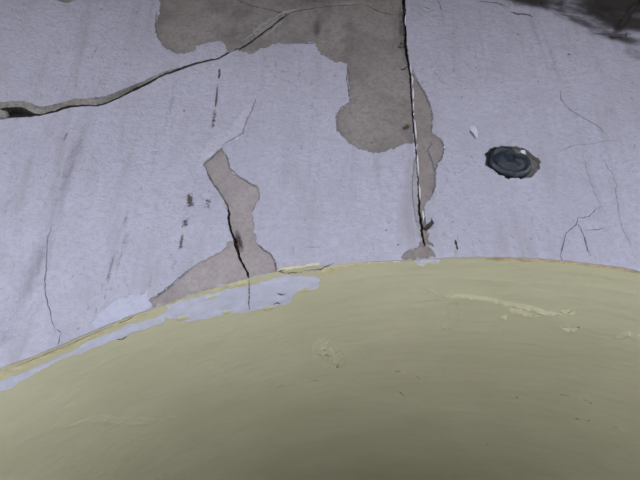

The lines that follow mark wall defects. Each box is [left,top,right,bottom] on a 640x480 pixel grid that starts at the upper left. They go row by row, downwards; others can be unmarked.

crack [0,0,425,247]
spalling [0,0,445,392]
crack [204,165,250,311]
spalling [485,146,541,179]
crack [558,91,631,258]